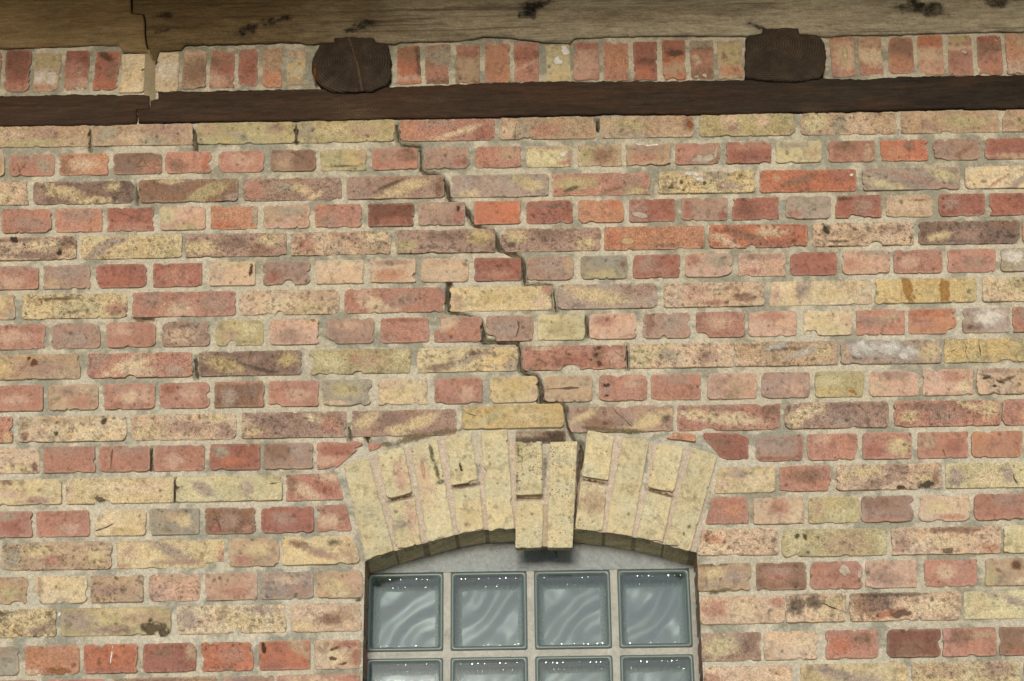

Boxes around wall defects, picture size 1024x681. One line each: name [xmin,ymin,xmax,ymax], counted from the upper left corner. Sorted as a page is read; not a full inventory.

crack [396,124,557,311]
crack [446,285,584,525]